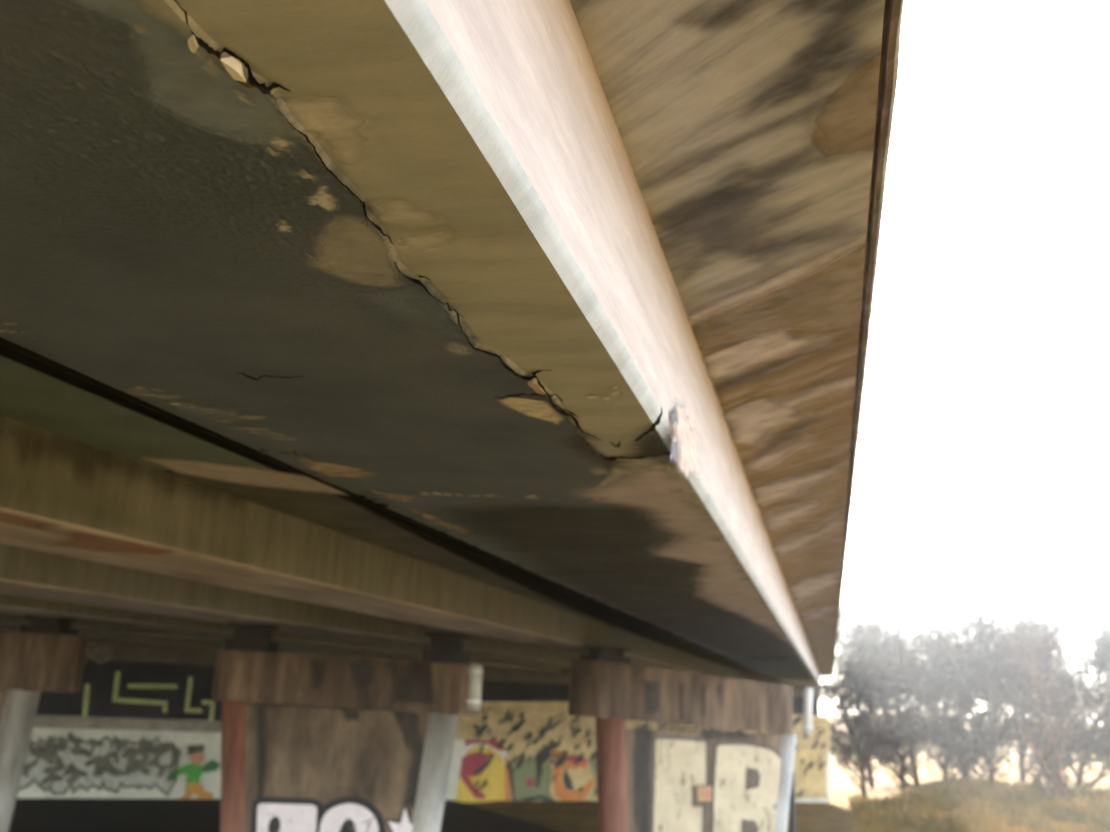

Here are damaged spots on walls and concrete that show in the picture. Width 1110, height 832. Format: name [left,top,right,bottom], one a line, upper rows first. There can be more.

crack [174,0,671,461]
spalling [500,398,562,424]
spalling [670,405,699,476]